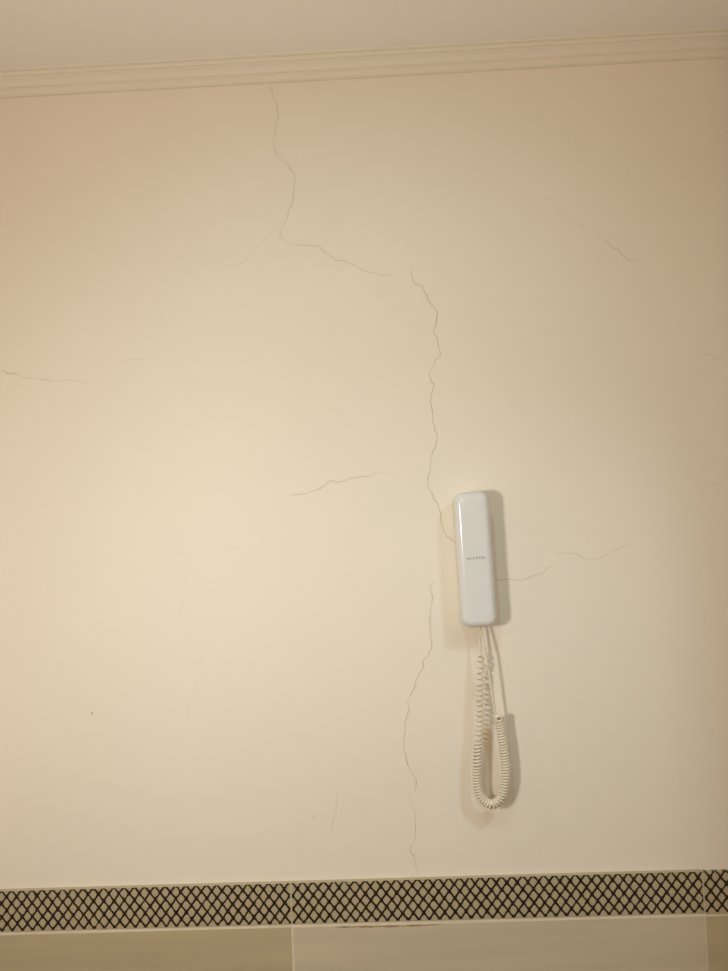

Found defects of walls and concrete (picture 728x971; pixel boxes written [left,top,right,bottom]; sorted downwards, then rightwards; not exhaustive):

crack [409,268,455,544]